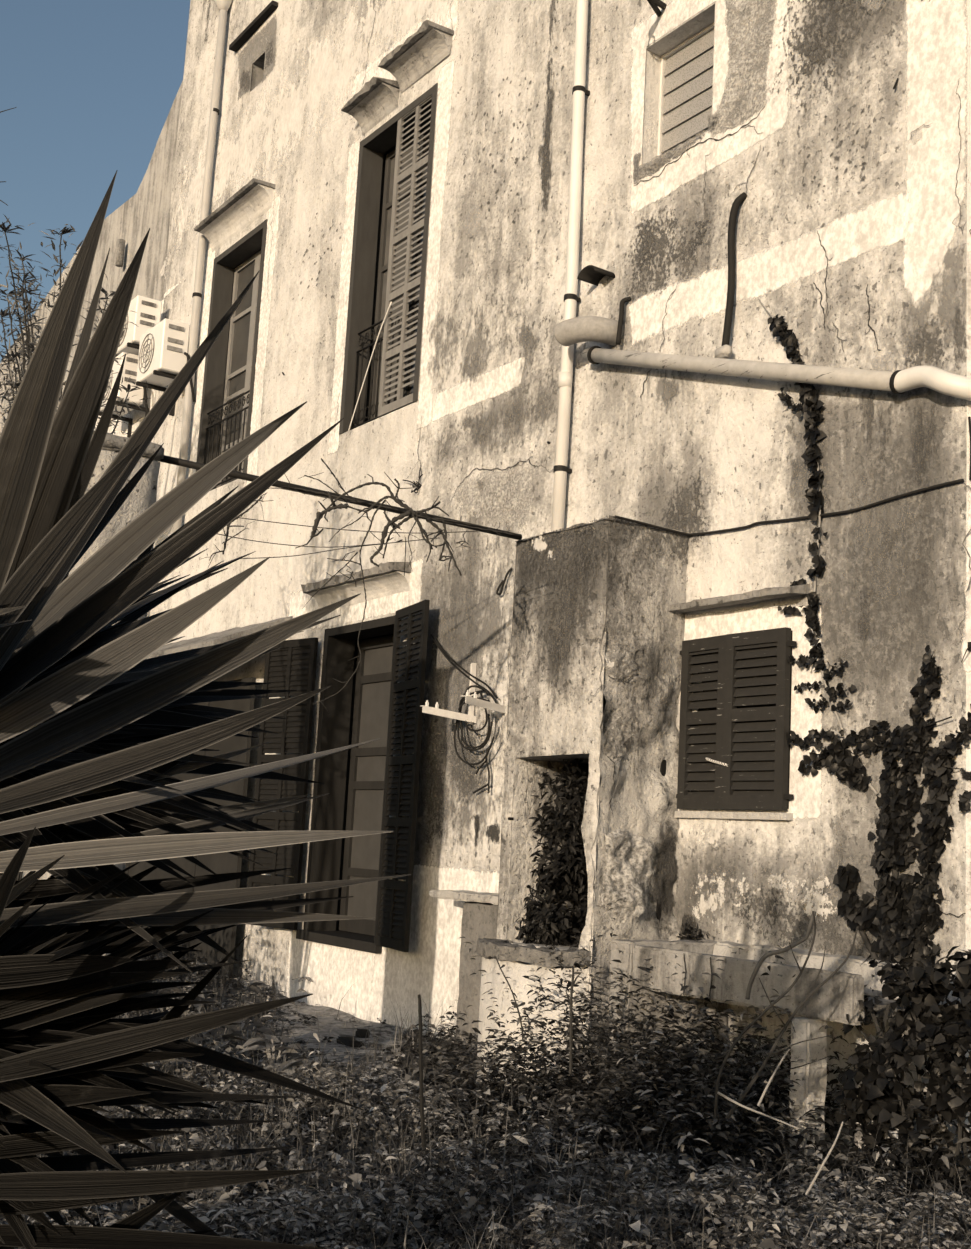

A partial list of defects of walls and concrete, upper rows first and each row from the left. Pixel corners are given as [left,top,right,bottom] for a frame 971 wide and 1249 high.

water stain [538,0,556,210]
water stain [771,0,887,112]
crack [909,80,971,234]
crack [813,231,880,352]
water stain [419,468,709,857]
peeling [684,873,837,923]